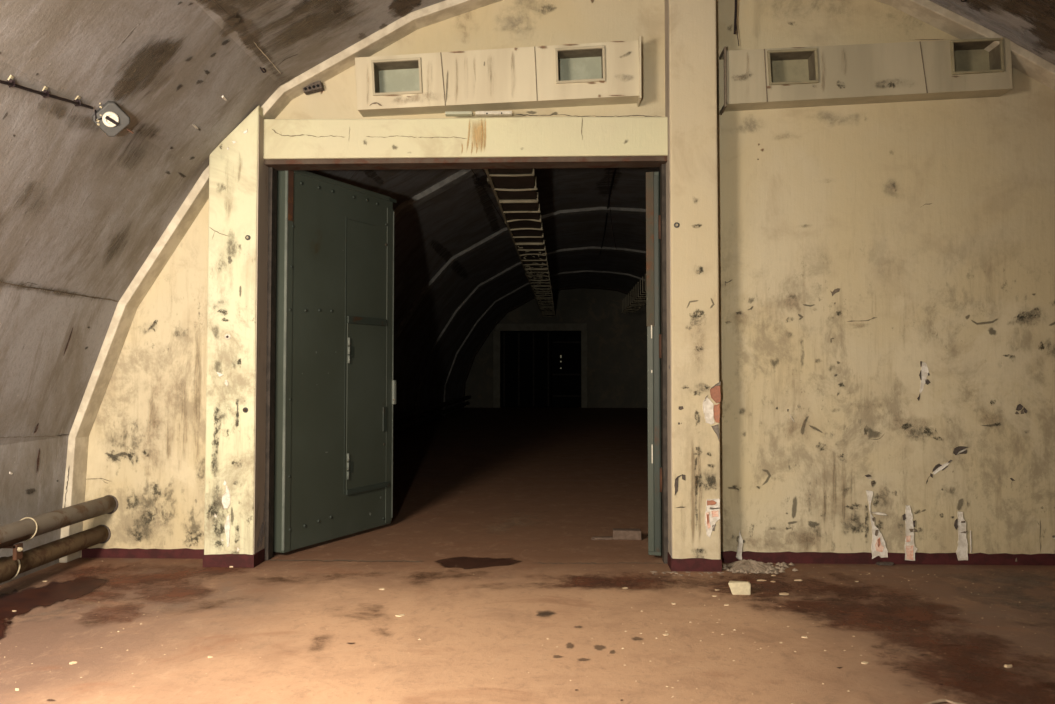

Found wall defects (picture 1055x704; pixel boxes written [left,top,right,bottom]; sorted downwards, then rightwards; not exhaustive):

water stain [196,0,360,69]
water stain [380,0,421,29]
rust [462,122,486,153]
water stain [106,435,149,463]
water stain [212,403,239,471]
spalling [702,381,721,442]
water stain [127,484,172,541]
water stain [206,496,239,554]
spalling [705,499,720,537]
spalling [865,474,888,559]
spalling [902,505,926,561]
spalling [952,499,972,560]